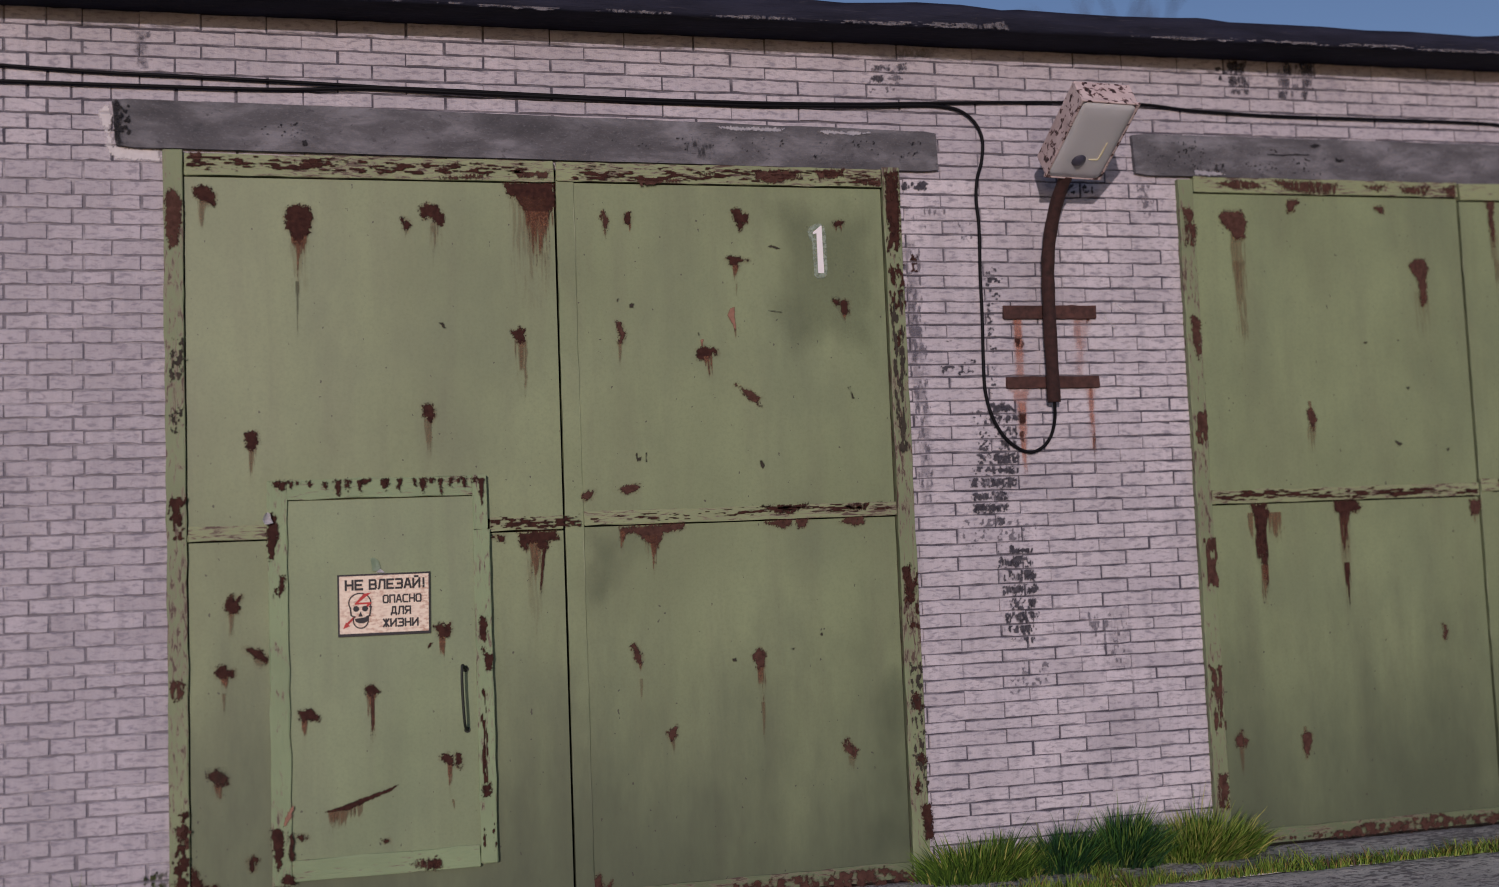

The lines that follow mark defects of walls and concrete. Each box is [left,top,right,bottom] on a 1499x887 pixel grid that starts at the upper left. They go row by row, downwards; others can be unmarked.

corrosion [283,203,313,276]
corrosion [503,181,556,253]
corrosion [884,171,902,253]
corrosion [1219,209,1248,240]
corrosion [1409,259,1429,307]
corrosion [272,476,485,505]
corrosion [491,529,560,590]
corrosion [619,522,685,568]
corrosion [902,562,920,629]
corrosion [1248,503,1281,586]
corrosion [1334,500,1361,604]
corrosion [909,661,935,841]